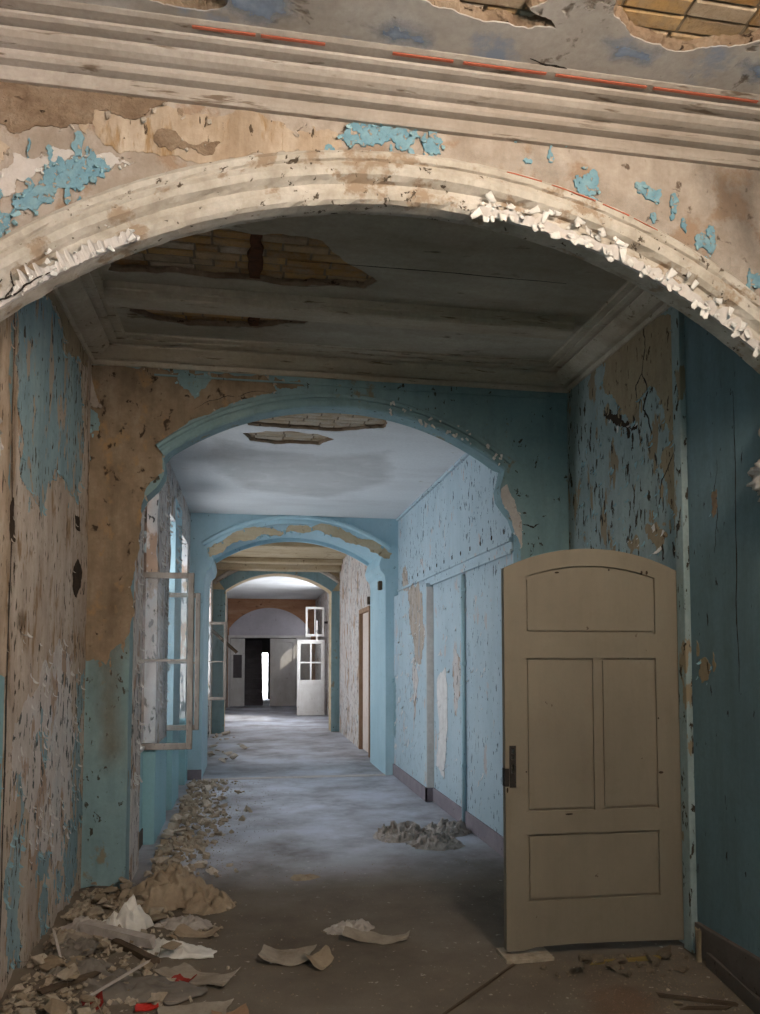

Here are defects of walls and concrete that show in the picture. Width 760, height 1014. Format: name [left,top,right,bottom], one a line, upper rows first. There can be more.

flaking render [153,0,228,10]
flaking render [428,0,555,28]
flaking render [614,0,760,51]
flaking render [0,81,445,238]
peeling [469,181,760,358]
crack [0,271,50,499]
flaking render [243,401,503,467]
flaking render [501,485,523,549]
peeling [574,314,675,564]
crack [635,329,652,434]
peeling [0,225,392,975]
crack [0,543,12,934]